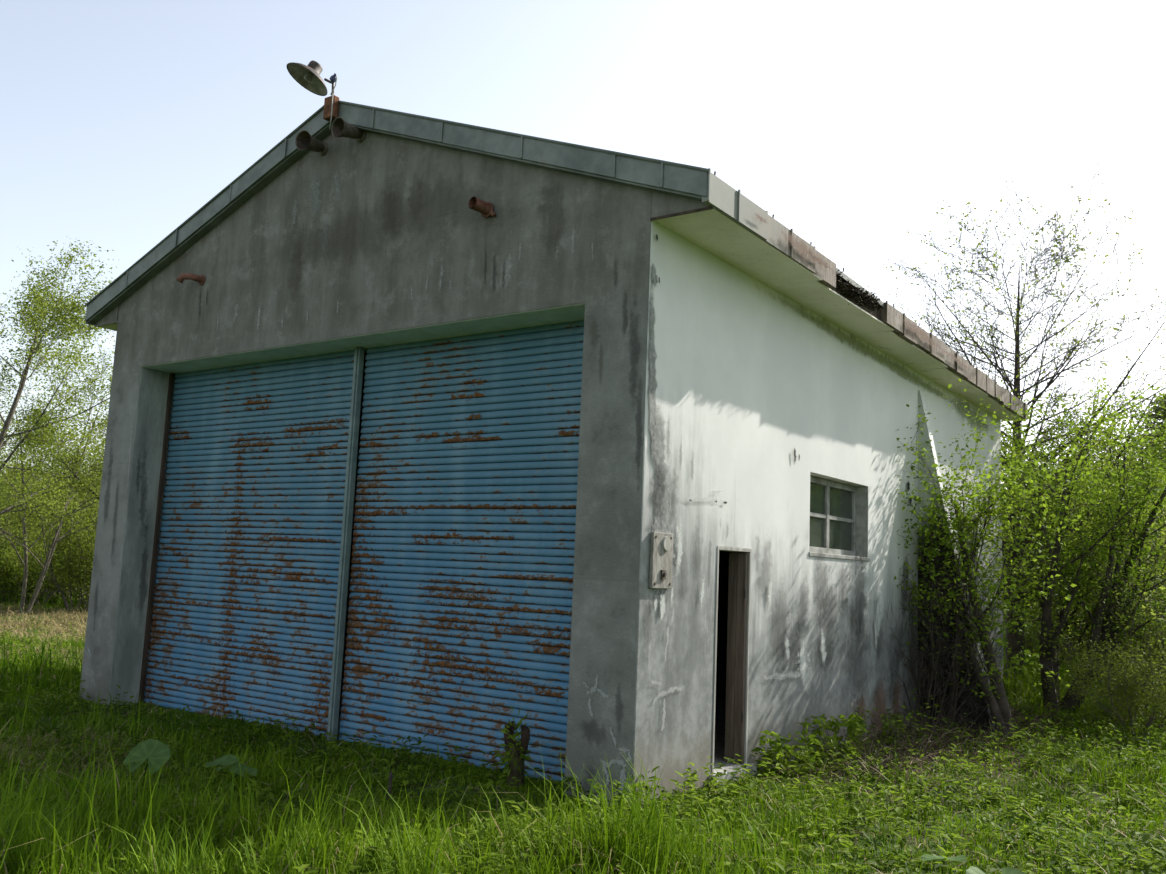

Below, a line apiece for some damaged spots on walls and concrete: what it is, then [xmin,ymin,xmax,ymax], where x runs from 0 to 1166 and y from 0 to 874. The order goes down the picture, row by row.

corrosion [782,232,830,268]
corrosion [904,320,969,370]
corrosion [242,393,276,411]
corrosion [416,379,502,448]
corrosion [555,425,580,437]
corrosion [144,418,348,718]
corrosion [297,477,576,739]